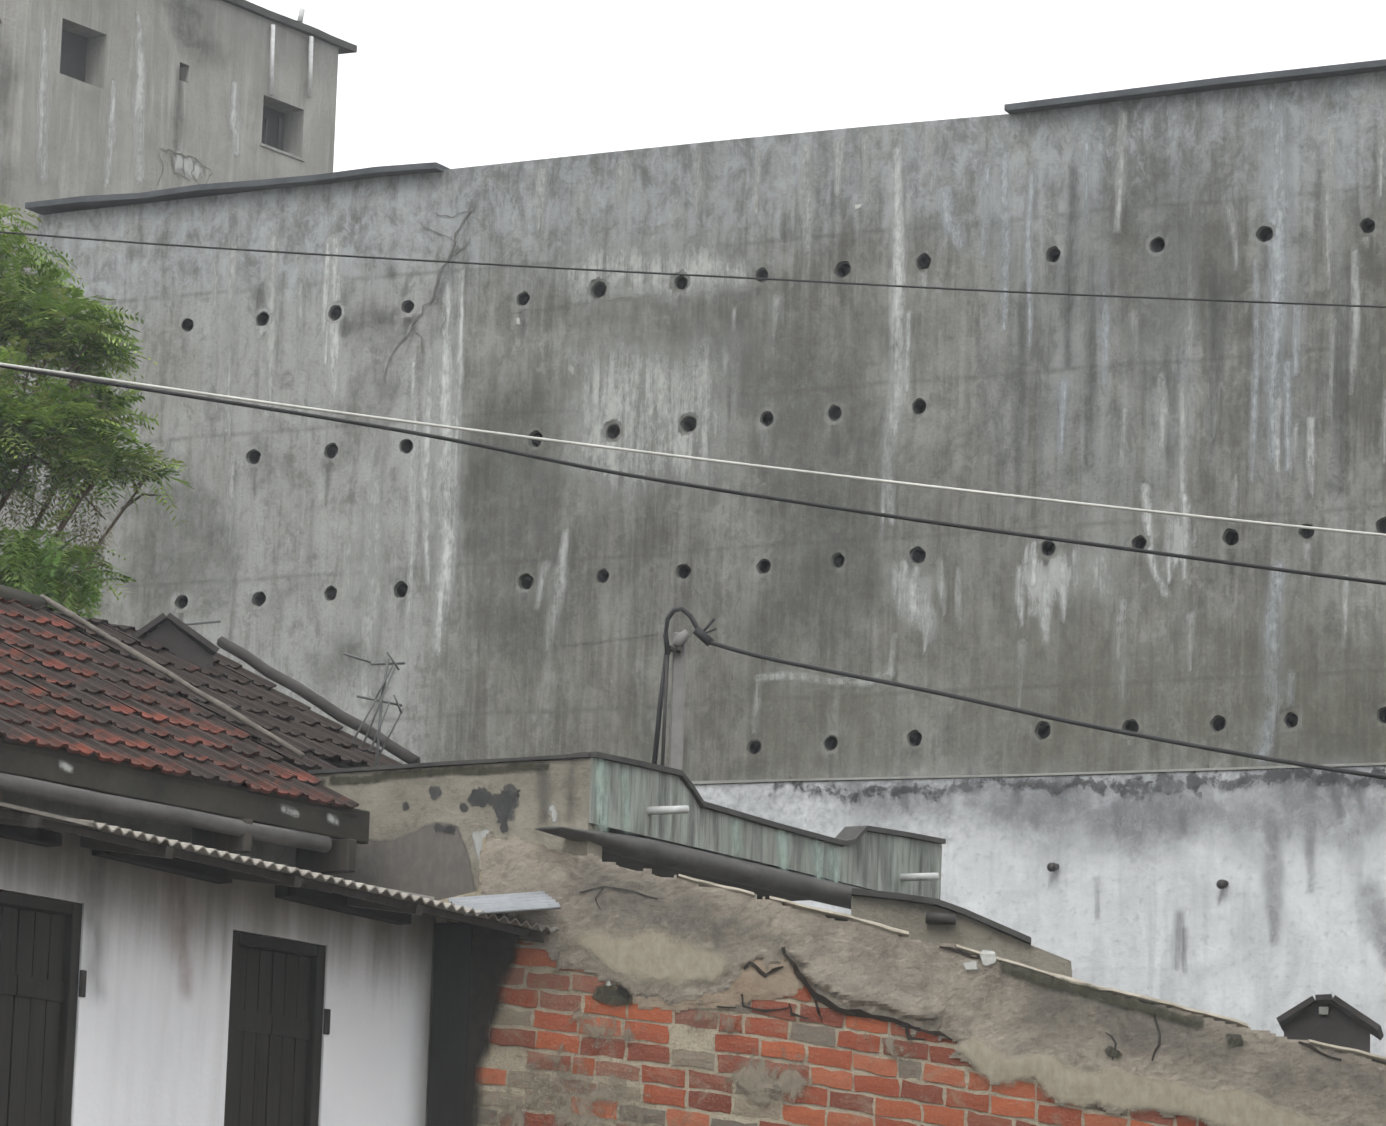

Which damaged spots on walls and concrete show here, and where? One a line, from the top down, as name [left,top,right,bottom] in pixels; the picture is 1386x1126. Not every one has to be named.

leakage [1116,111,1126,229]
crack [383,199,474,384]
leakage [881,149,910,525]
leakage [1252,102,1314,480]
leakage [1329,238,1368,412]
leakage [1158,374,1187,499]
leakage [1143,484,1168,595]
leakage [753,560,1386,940]
peeling [574,930,728,1006]
spalling [963,950,996,970]
peeling [957,1037,1319,1126]
spalling [1226,1034,1243,1048]